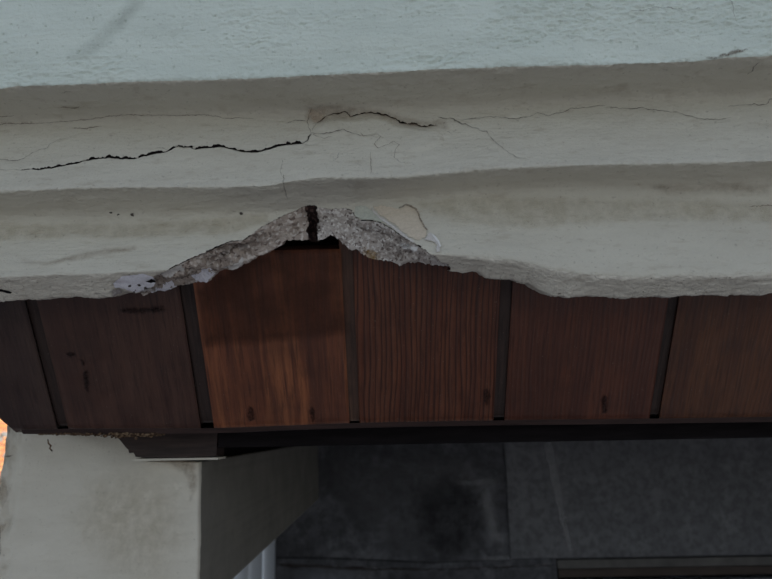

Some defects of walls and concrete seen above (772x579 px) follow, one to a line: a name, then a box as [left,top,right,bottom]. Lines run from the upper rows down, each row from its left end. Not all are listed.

crack [1,99,770,197]
spalling [112,204,449,297]